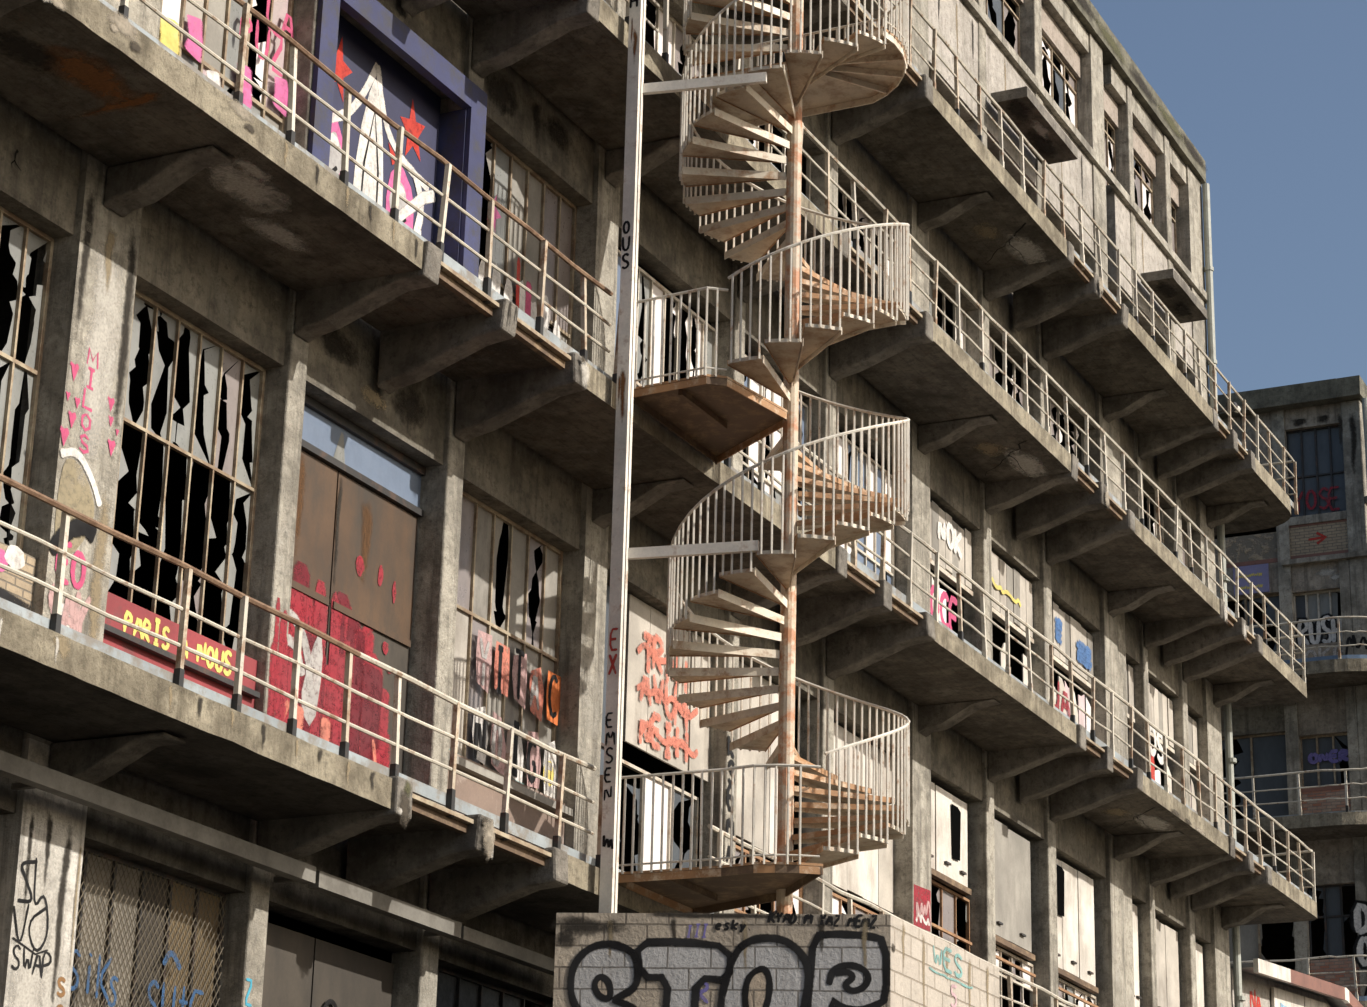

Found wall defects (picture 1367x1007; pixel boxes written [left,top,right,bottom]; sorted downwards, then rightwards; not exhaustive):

water stain [10,815,81,1007]